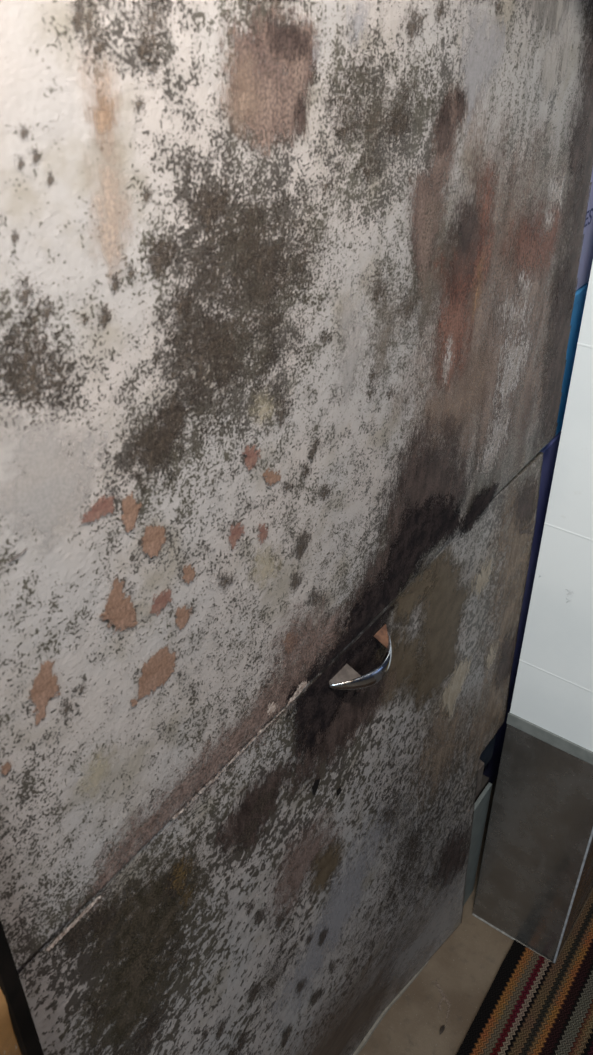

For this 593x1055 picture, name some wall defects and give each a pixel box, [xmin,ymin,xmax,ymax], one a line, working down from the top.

leakage [0,0,488,506]
leakage [529,0,593,449]
peeling [242,445,281,486]
peeling [81,492,166,558]
peeling [229,522,268,549]
peeling [99,578,138,635]
peeling [150,588,193,630]
peeling [28,660,61,726]
peeling [130,645,177,707]
leakage [54,414,538,1055]